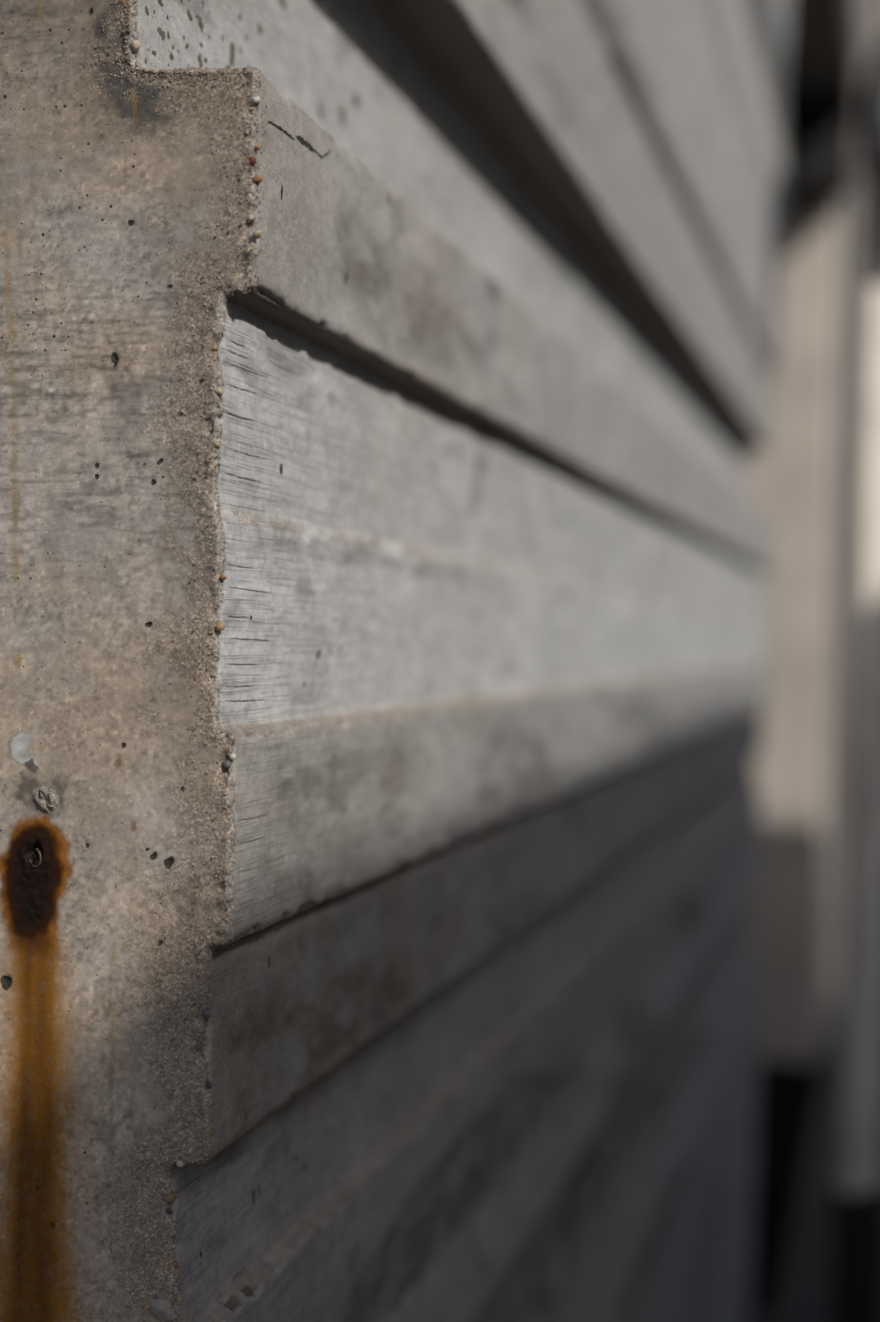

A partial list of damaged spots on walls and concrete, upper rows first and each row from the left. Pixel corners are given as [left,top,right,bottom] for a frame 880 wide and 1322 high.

rust [0,816,72,1322]